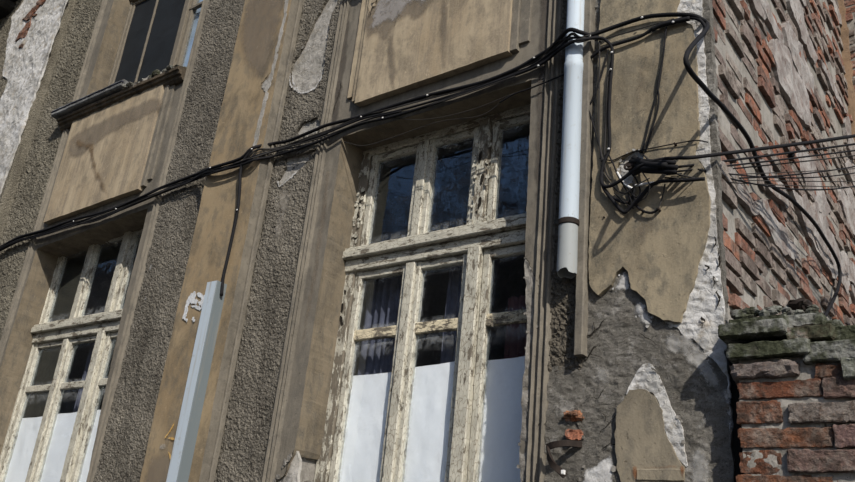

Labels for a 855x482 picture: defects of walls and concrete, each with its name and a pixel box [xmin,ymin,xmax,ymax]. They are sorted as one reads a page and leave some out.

spalling [0,0,68,194]
spalling [253,0,289,146]
spalling [289,0,338,94]
peeling [373,0,422,26]
peeling [352,167,368,244]
spalling [664,0,732,425]
spalling [612,273,629,290]
spalling [635,303,654,328]
spalling [561,407,585,441]
spalling [626,363,708,482]
spalling [272,451,311,482]
spalling [578,458,616,482]